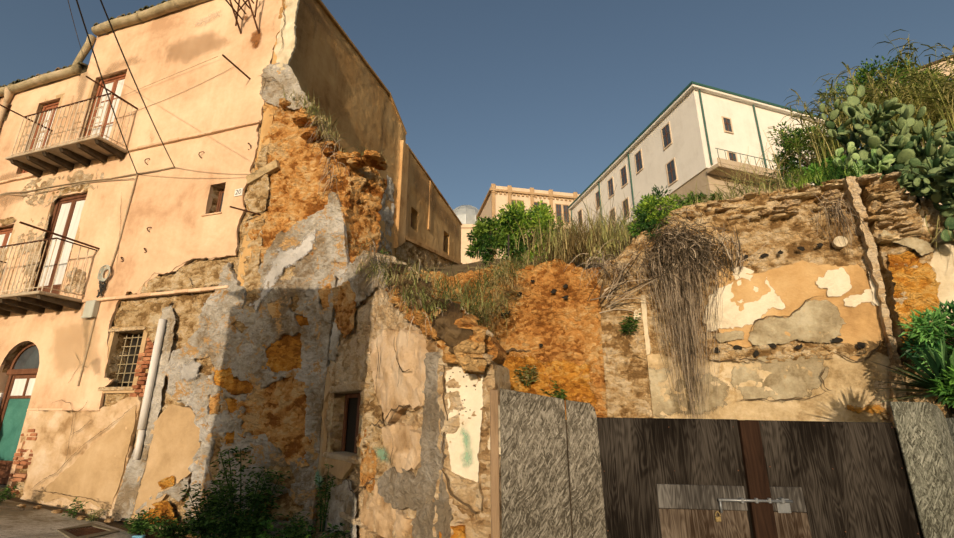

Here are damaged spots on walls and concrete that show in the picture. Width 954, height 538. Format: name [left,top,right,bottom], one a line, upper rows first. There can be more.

flaking render [135,174,456,538]
flaking render [648,246,885,418]
spalling [887,251,941,356]
flaking render [439,366,484,538]